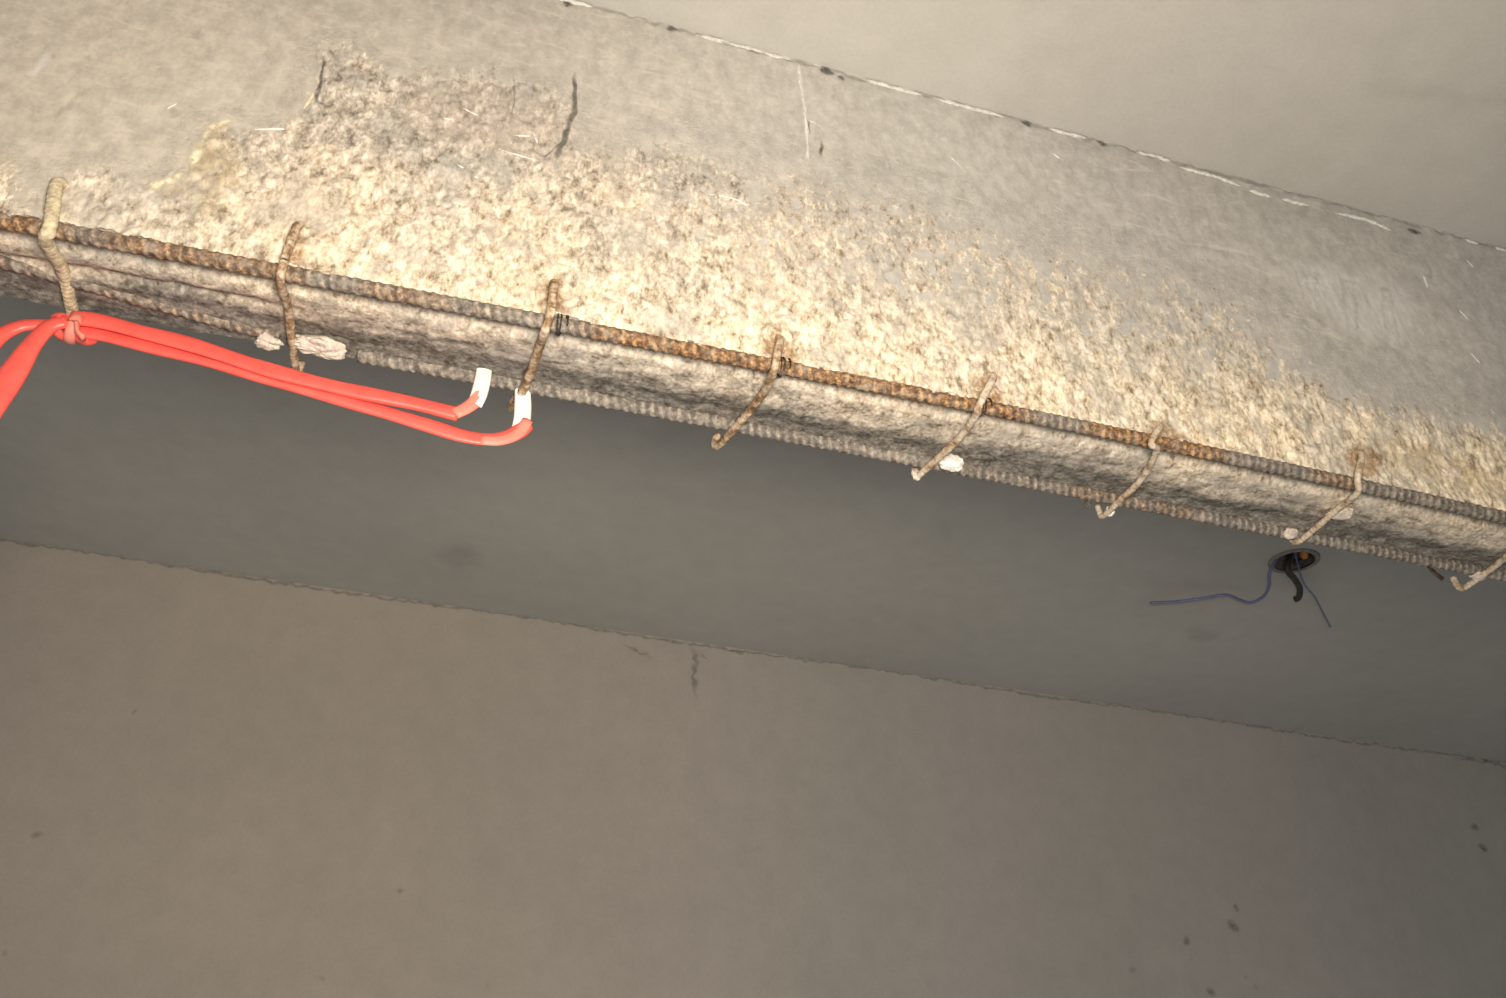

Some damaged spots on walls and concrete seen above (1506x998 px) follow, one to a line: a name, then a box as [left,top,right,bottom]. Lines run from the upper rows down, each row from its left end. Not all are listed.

crack [545,81,577,157]
spalling [0,27,1506,582]